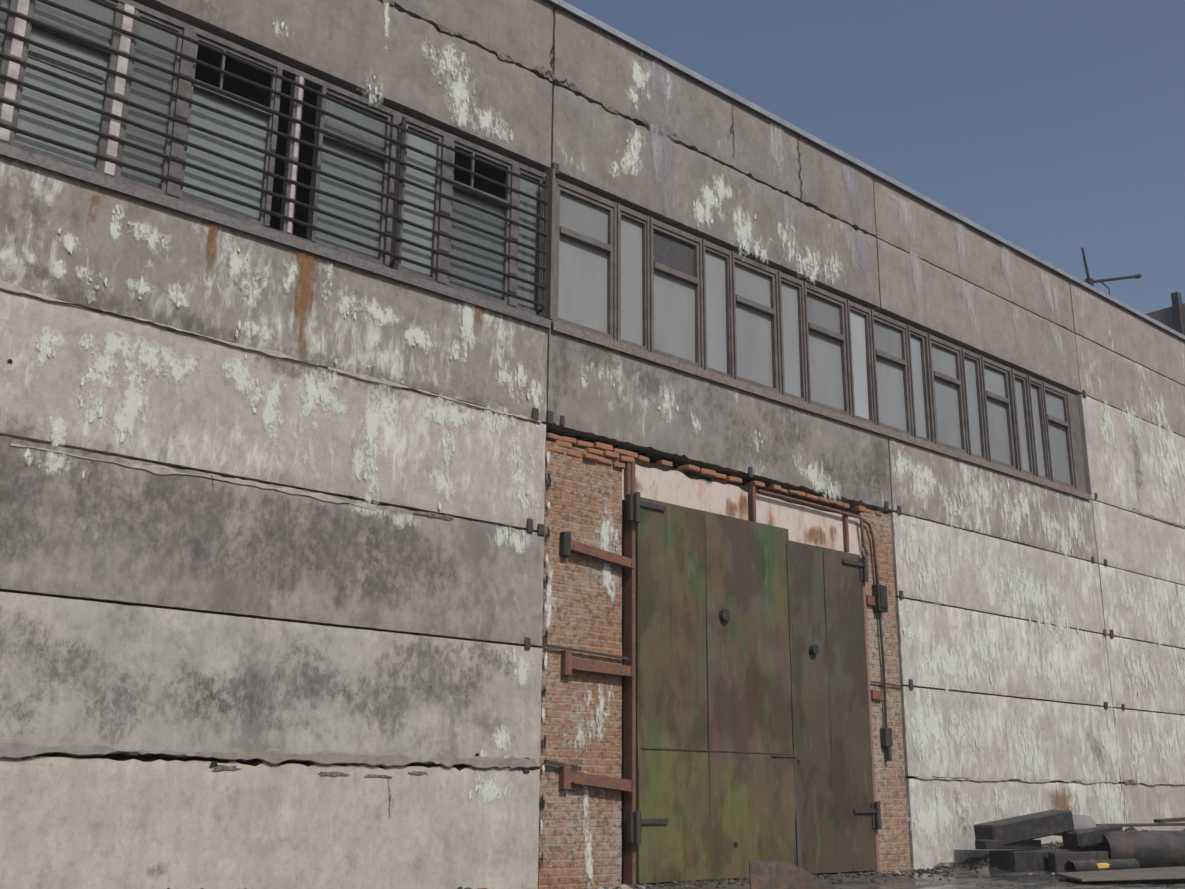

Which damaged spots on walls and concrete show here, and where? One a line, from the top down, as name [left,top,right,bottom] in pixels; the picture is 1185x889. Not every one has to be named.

peeling [422,45,513,140]
crack [542,41,581,92]
crack [796,134,804,203]
rust [208,221,217,263]
peeling [694,176,841,283]
rust [295,248,315,353]
peeling [323,265,432,353]
peeling [79,333,199,443]
spalling [352,363,949,605]
rust [727,496,748,515]
rust [806,527,836,544]
peeling [892,441,1084,557]